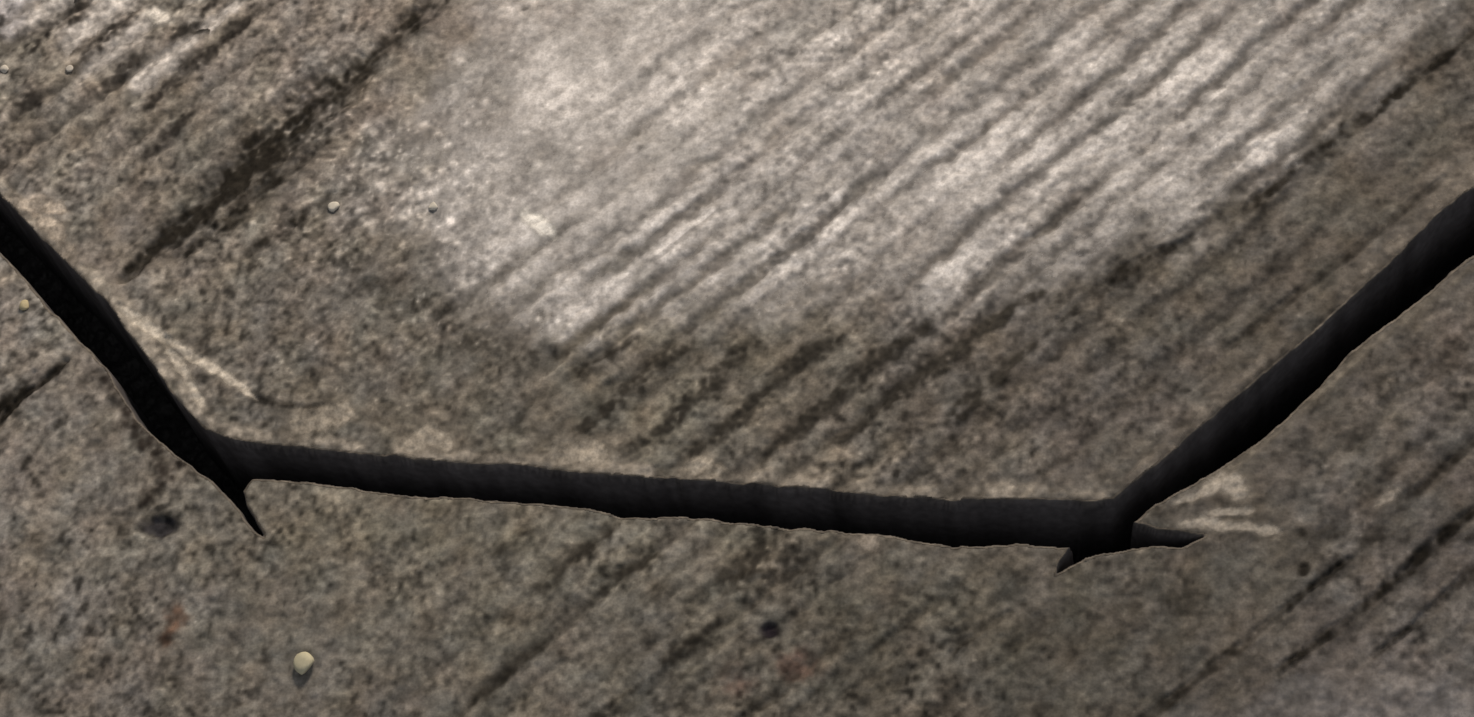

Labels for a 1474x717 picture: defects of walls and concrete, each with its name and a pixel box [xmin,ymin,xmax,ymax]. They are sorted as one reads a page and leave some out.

crack [124,0,447,280]
crack [1253,35,1469,207]
crack [1106,244,1177,284]
crack [0,364,66,422]
crack [1419,443,1474,492]
crack [1286,560,1345,610]
crack [1363,511,1474,609]
crack [1158,647,1237,710]
crack [1281,629,1331,670]
crack [1394,625,1414,640]